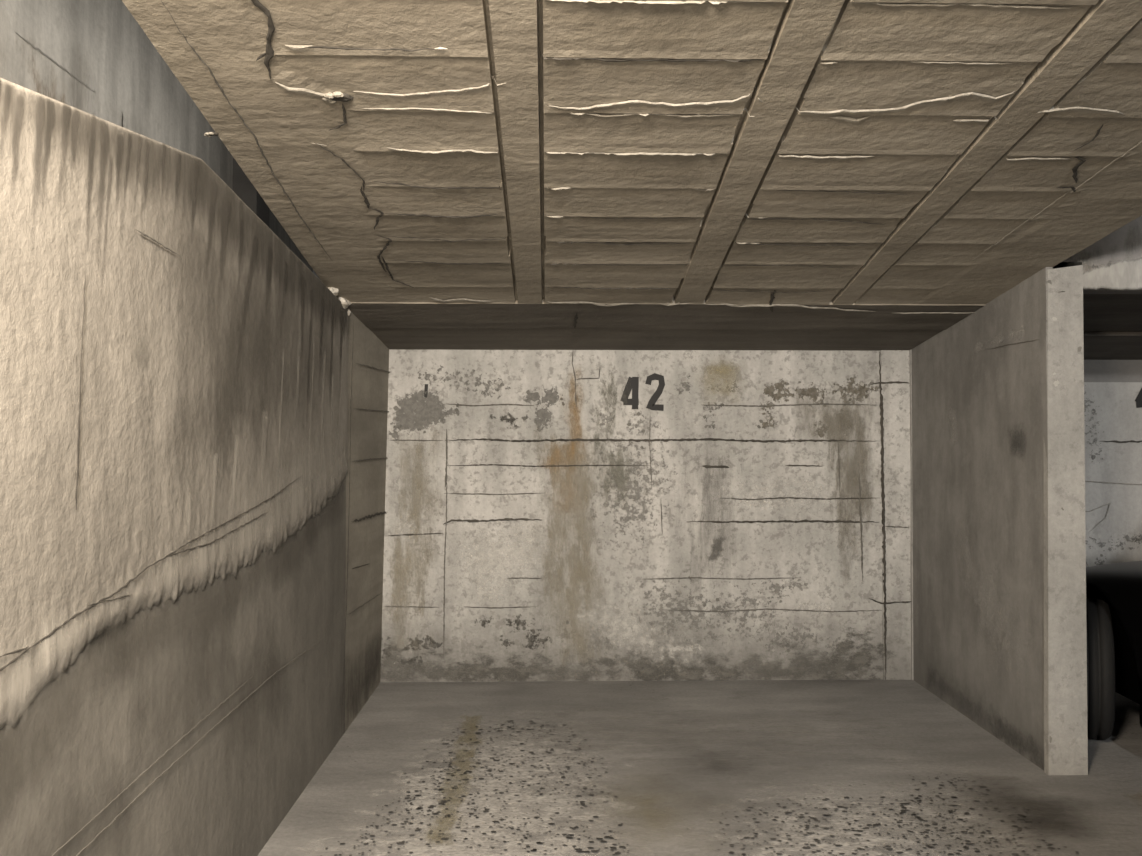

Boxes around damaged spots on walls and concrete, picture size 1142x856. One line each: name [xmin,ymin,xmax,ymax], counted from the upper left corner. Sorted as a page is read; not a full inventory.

leakage [0,83,23,163]
leakage [36,98,347,409]
crack [161,0,331,259]
crack [314,104,506,288]
crack [75,276,86,508]
leakage [11,620,77,700]
crack [0,479,297,671]
leakage [165,437,345,596]
leakage [380,558,881,682]